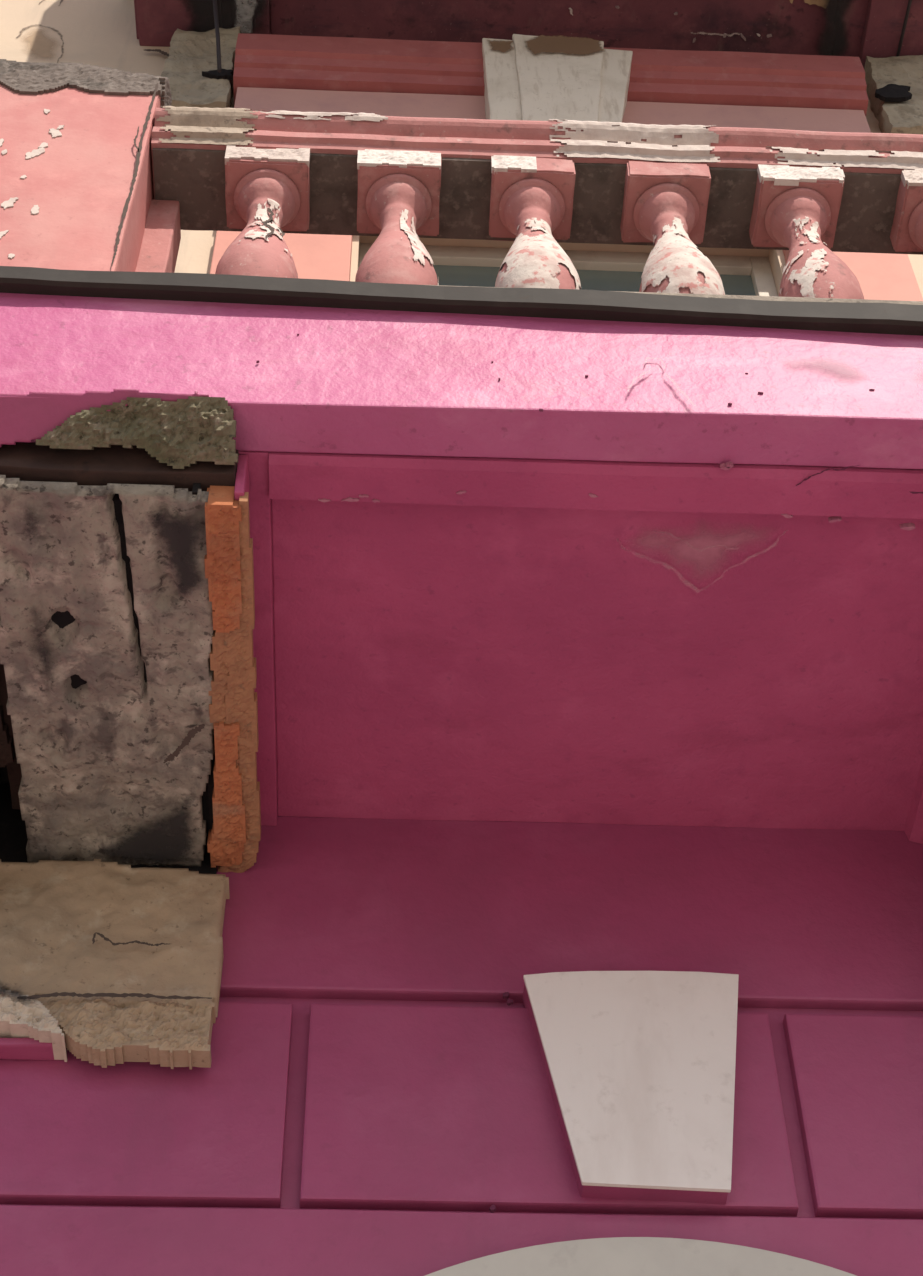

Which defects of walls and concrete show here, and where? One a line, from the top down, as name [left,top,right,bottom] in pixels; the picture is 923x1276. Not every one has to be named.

leakage [184,0,267,34]
spalling [0,24,388,167]
peeling [357,149,441,169]
peeling [491,155,537,173]
peeling [548,119,721,162]
peeling [239,198,292,255]
peeling [400,209,433,265]
peeling [495,218,581,290]
peeling [641,217,725,295]
peeling [779,217,836,298]
spalling [0,389,261,1069]
crack [17,992,212,1000]